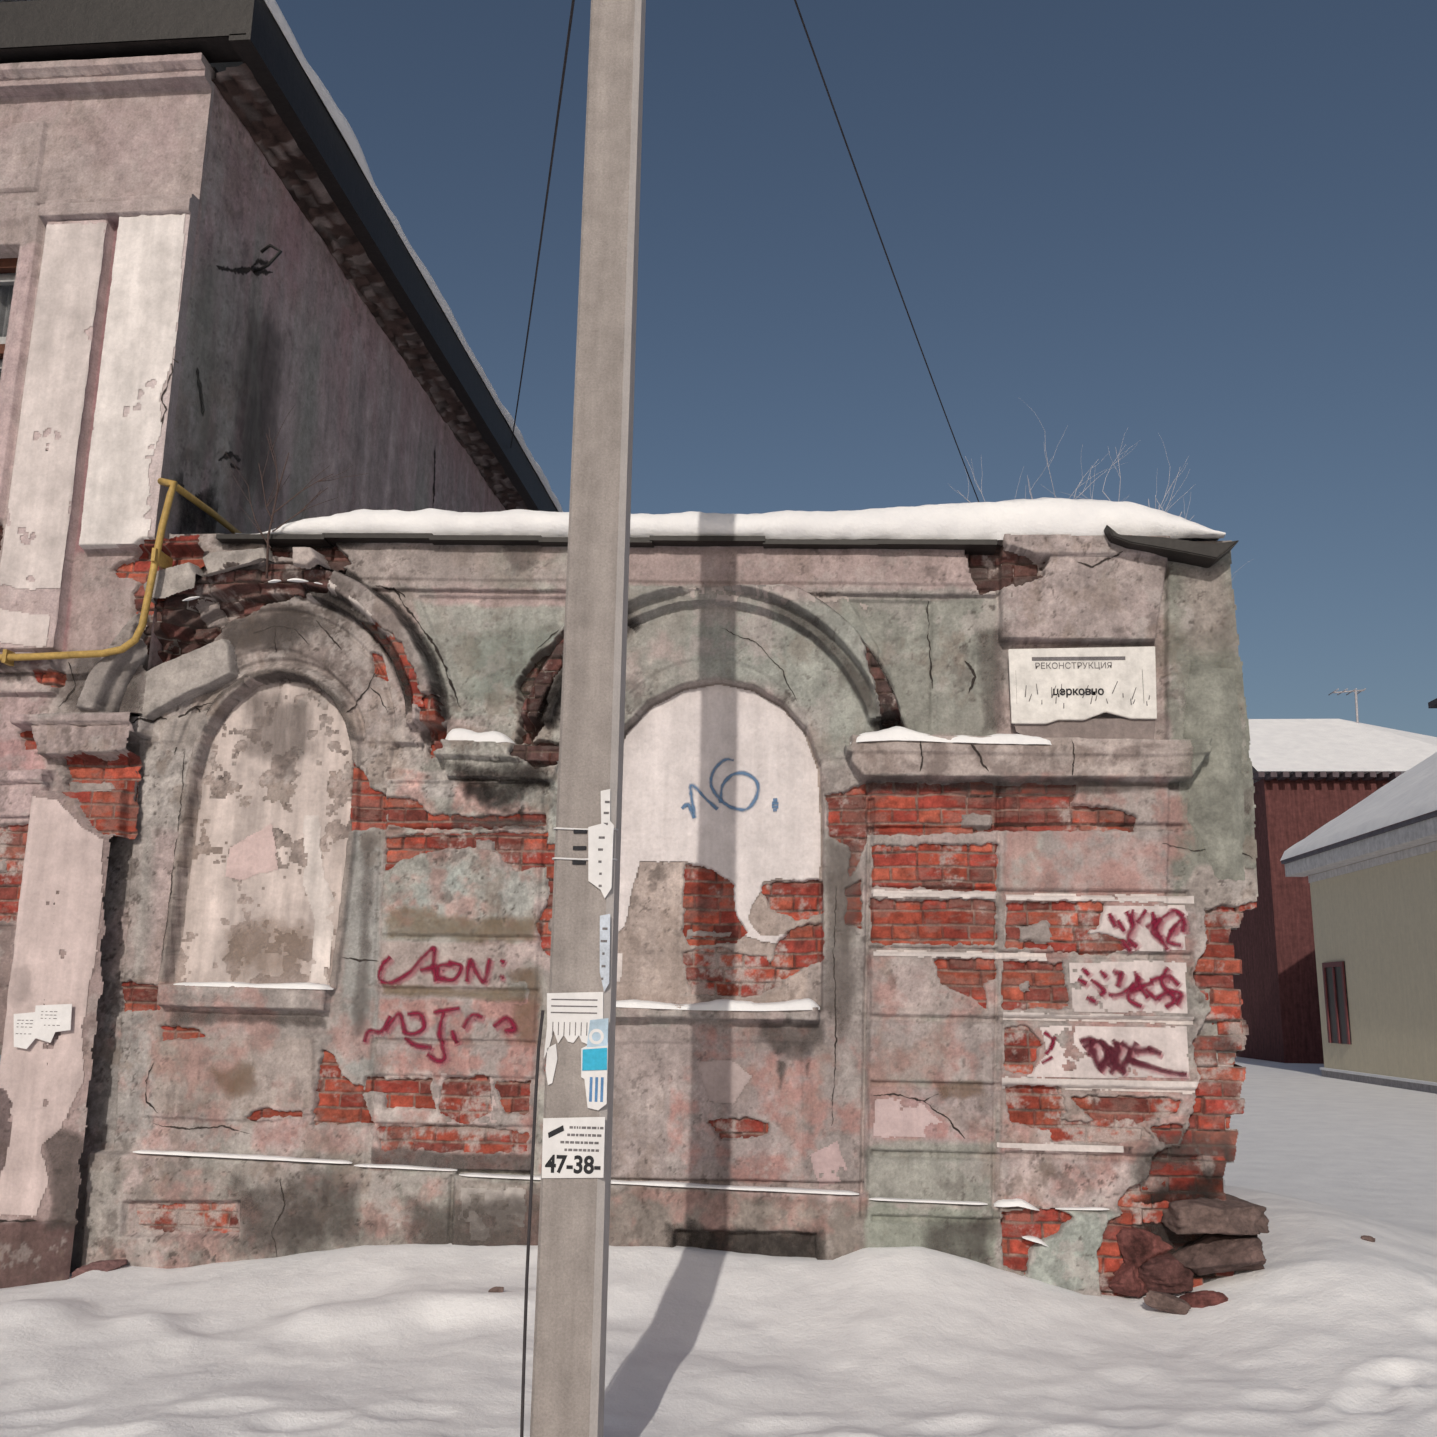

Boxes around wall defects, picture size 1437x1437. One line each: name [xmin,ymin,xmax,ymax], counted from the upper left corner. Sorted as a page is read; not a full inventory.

peeling [0,213,447,759]
flaking render [965,544,1045,595]
flaking render [510,639,564,769]
crack [722,628,796,699]
peeling [180,681,555,985]
peeling [0,750,143,1217]
peeling [618,685,1257,1297]
flaking render [247,1050,546,1154]
crack [873,1093,964,1138]